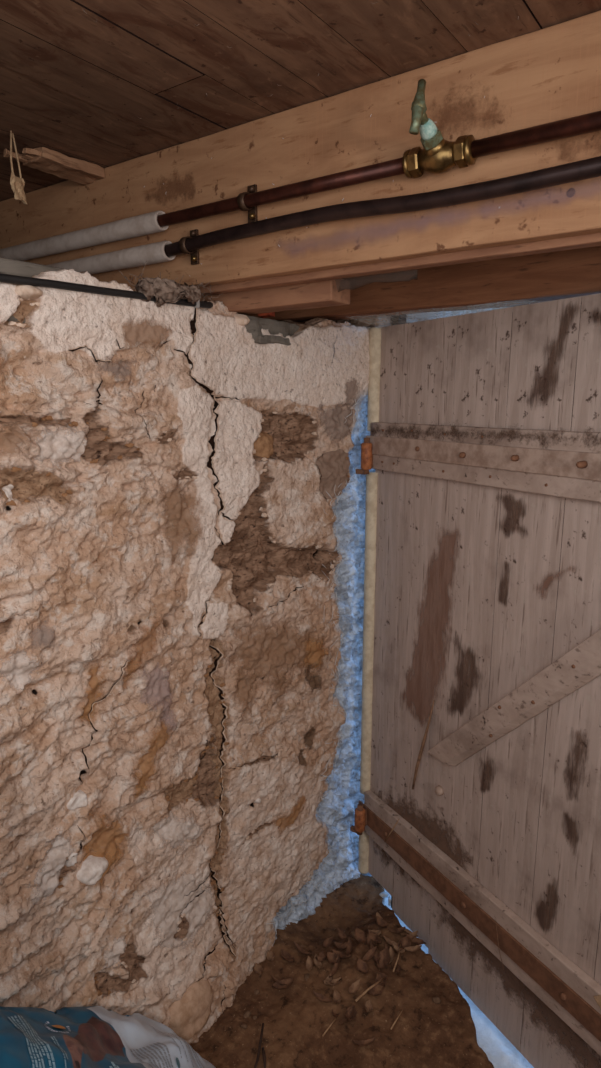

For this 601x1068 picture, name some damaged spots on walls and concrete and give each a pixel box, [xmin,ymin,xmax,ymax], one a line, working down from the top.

damp [530,305,576,403]
spalling [0,404,142,465]
crack [160,308,239,546]
damp [318,379,358,440]
spalling [211,411,339,616]
crack [82,660,129,769]
damp [229,621,328,719]
damp [298,727,315,766]
crack [181,584,276,1014]
damp [276,796,306,832]